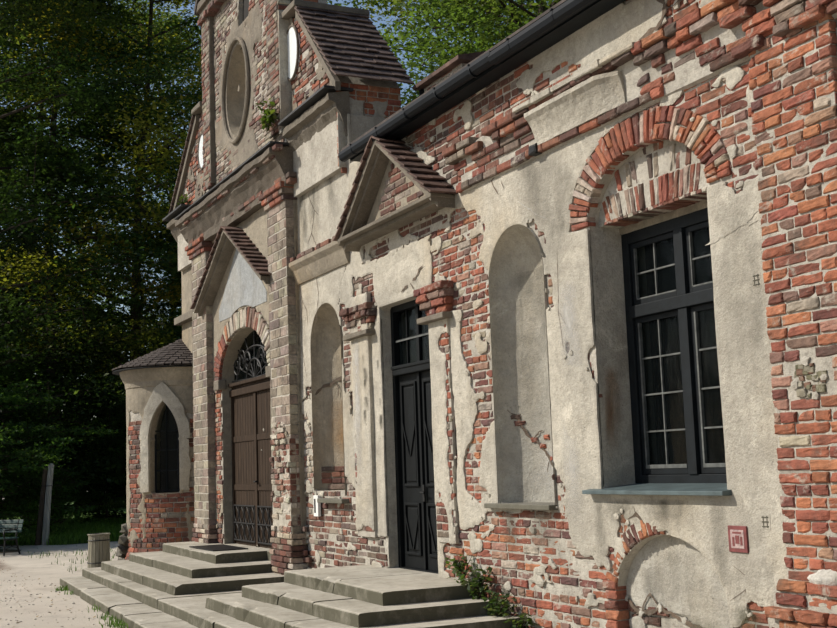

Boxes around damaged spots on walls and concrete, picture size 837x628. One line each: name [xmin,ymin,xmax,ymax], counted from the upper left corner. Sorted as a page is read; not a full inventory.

crack [639,0,679,40]
flaking render [661,0,701,28]
flaking render [405,61,581,185]
flaking render [670,61,758,194]
crack [299,279,342,400]
flaking render [353,273,377,320]
flaking render [364,208,494,503]
flaking render [125,421,195,560]
flaking render [261,415,388,568]
flaking render [444,475,615,628]
crack [507,410,555,480]
flaking render [625,595,670,627]